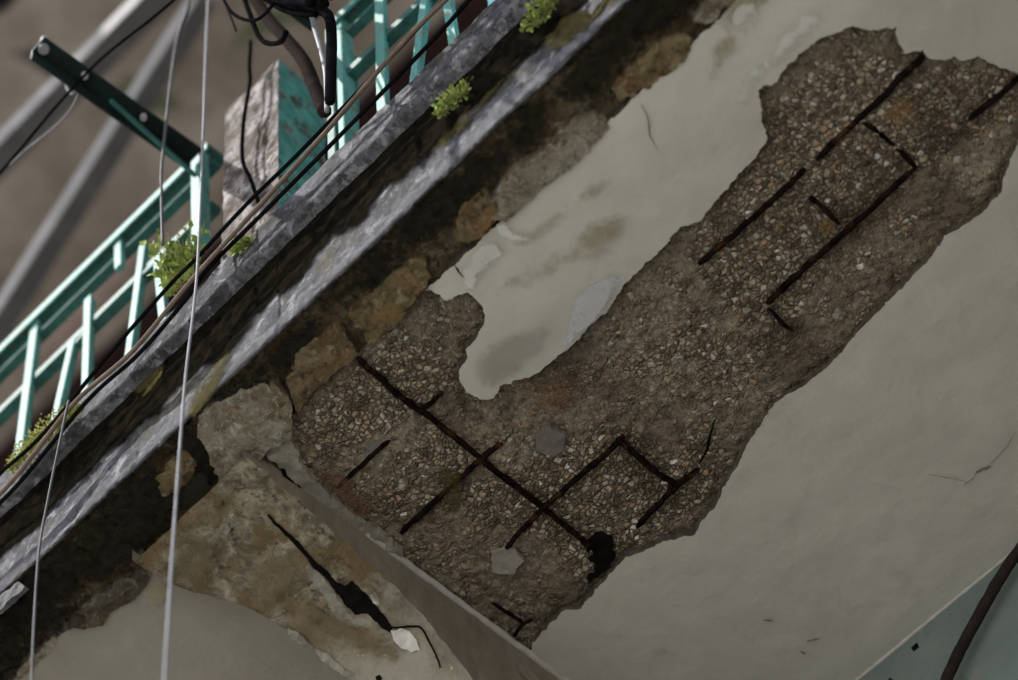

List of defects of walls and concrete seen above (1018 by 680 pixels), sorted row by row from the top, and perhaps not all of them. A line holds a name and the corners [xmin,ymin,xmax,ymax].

spalling [265,26,1018,648]
peeling [0,582,29,614]
crack [267,514,441,668]
peeling [288,627,353,677]
peeling [391,628,420,653]